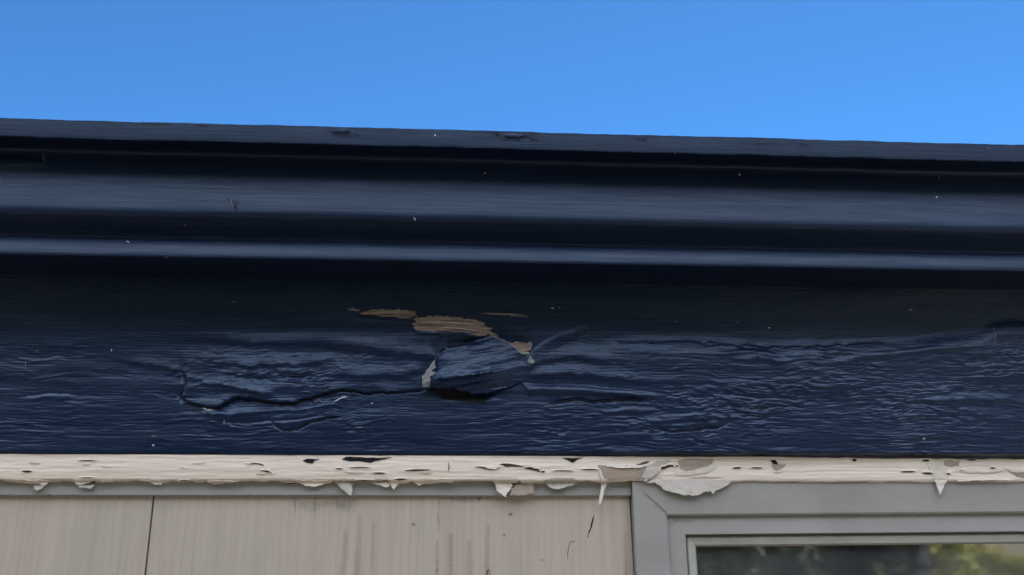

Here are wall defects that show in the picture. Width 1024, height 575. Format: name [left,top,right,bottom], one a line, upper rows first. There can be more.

peeling [348,308,540,403]
crack [154,370,424,433]
peeling [15,461,49,490]
peeling [72,458,114,489]
peeling [283,457,453,496]
peeling [475,458,785,505]
peeling [901,459,1024,495]